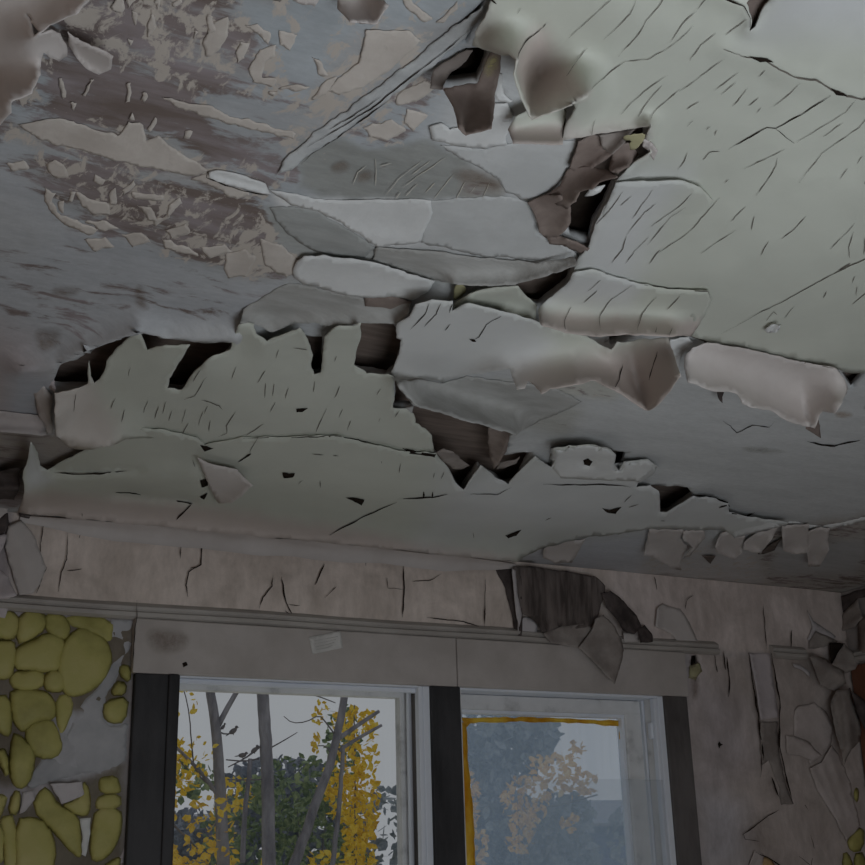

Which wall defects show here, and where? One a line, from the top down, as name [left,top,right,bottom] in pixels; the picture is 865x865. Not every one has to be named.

crack [598,0,865,192]
crack [593,180,728,264]
peeling [0,0,865,595]
crack [564,223,865,370]
crack [111,348,306,462]
crack [291,387,447,535]
crack [548,484,636,508]
crack [259,579,300,614]
crack [387,568,439,617]
peeling [0,611,133,865]
peeling [793,702,833,764]
peeling [842,828,865,865]